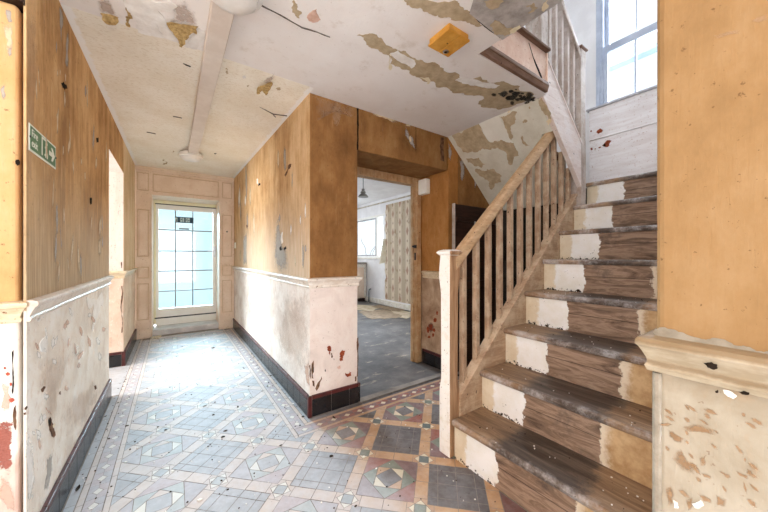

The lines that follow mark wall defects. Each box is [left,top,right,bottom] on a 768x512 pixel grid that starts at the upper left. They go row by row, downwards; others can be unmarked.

peeling [100,2,133,27]
peeling [157,6,205,50]
crack [262,5,330,38]
peeling [291,0,320,23]
peeling [242,76,281,95]
peeling [358,33,551,190]
leakage [492,89,535,105]
peeling [275,215,306,269]
spalling [0,420,14,508]
peeling [26,386,56,499]
peeling [660,405,718,444]
peeling [665,445,758,509]